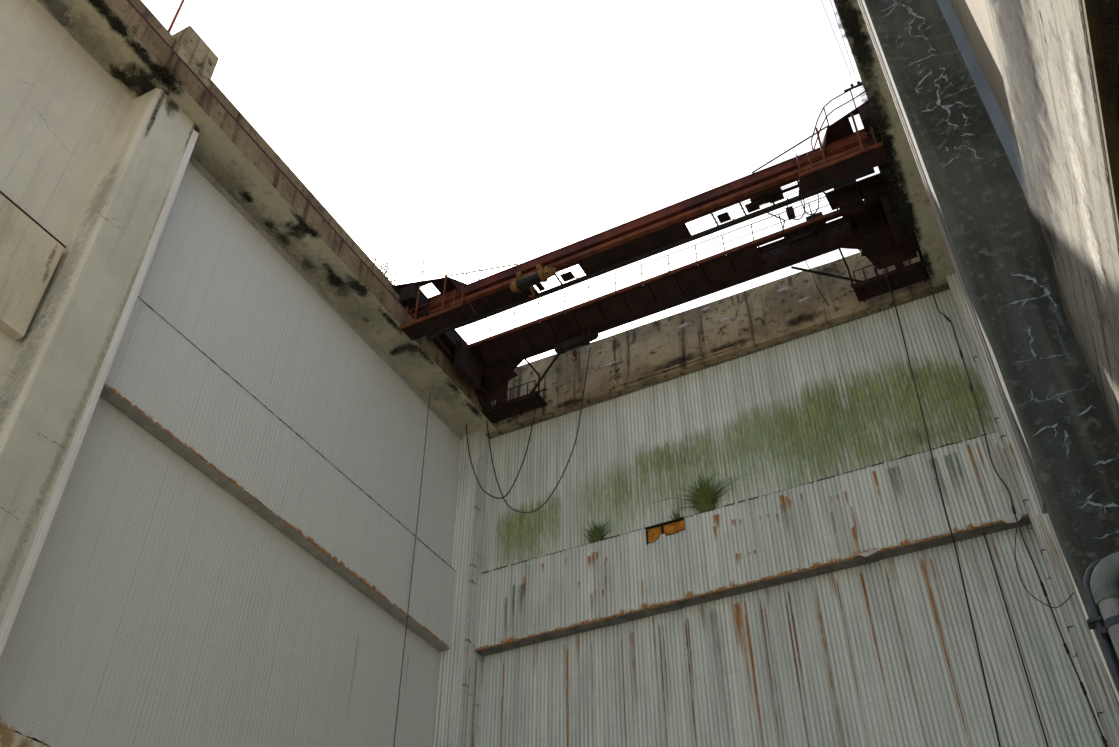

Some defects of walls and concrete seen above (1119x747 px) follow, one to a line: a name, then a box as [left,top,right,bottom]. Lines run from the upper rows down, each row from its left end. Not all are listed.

leakage [44,0,68,26]
leakage [89,0,183,130]
crack [882,0,997,168]
leakage [264,214,319,245]
leakage [301,261,367,297]
leakage [380,309,434,364]
leakage [655,354,692,373]
leakage [787,313,819,325]
leakage [639,357,986,488]
corrosion [110,387,447,646]
corrosion [465,491,1004,747]